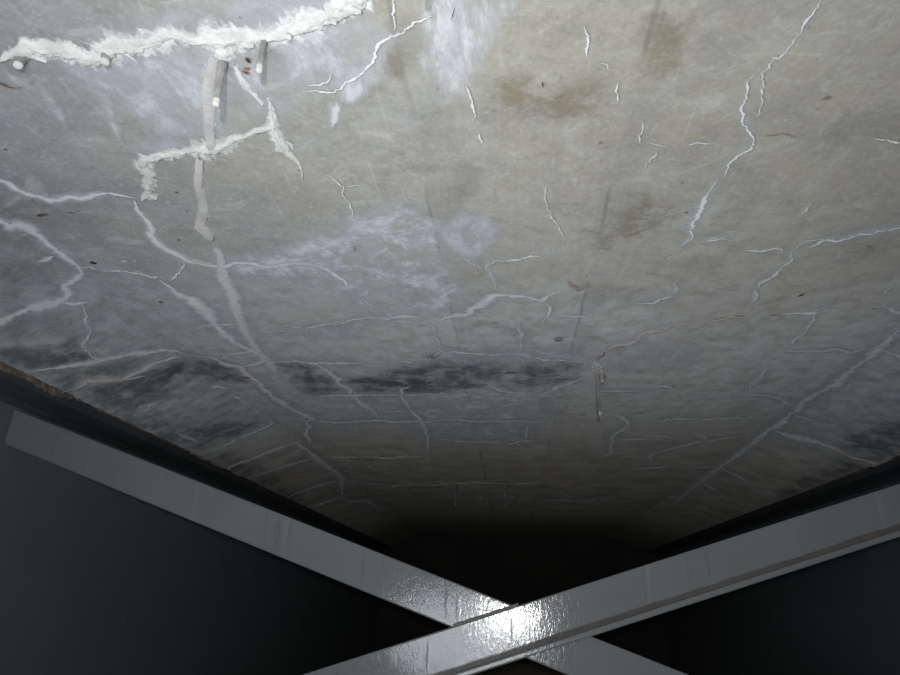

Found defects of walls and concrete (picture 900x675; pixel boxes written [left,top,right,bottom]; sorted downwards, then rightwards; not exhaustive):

leakage [0,0,505,380]
crack [0,0,900,509]
leakage [359,343,696,445]